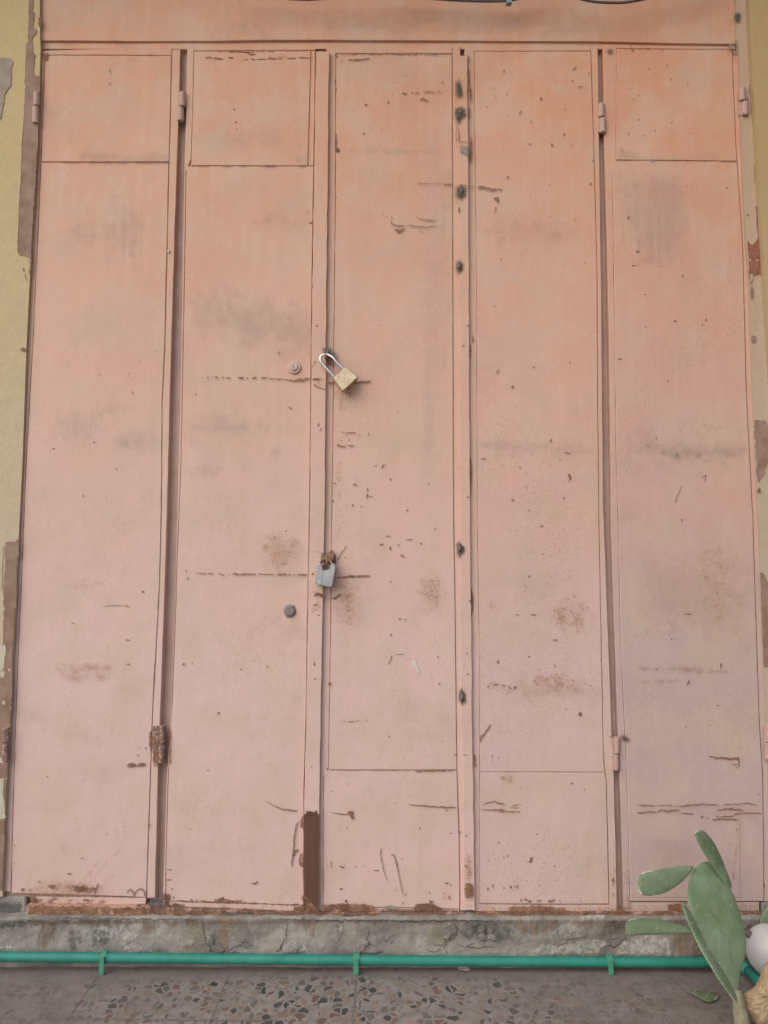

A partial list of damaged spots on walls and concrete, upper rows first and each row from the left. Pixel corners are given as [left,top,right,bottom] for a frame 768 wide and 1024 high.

peeling [0,0,42,280]
peeling [747,206,761,299]
rust [207,376,335,389]
peeling [754,420,768,493]
rust [185,534,314,579]
peeling [0,539,19,891]
rust [127,730,171,768]
rust [638,803,761,839]
rust [21,878,686,934]
crack [37,917,495,955]